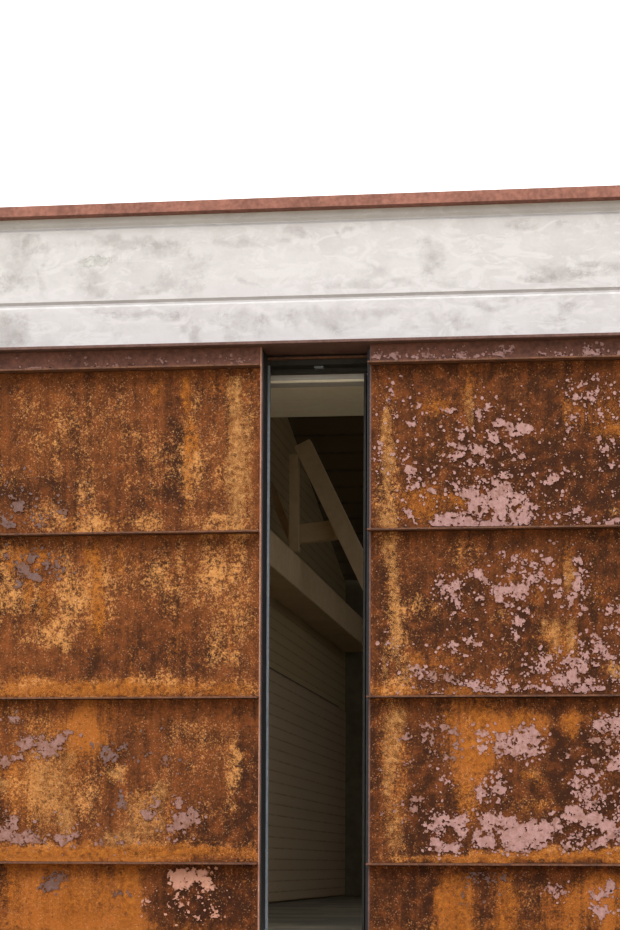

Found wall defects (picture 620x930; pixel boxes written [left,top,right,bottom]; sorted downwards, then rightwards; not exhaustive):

corrosion [228,378,250,506]
corrosion [382,409,394,480]
peeling [373,372,620,526]
peeling [0,477,94,529]
peeling [3,543,76,591]
peeling [0,809,82,855]
peeling [0,707,196,776]
peeling [91,779,208,856]
corrosion [385,708,405,795]
peeling [373,708,620,860]
peeling [105,866,230,926]